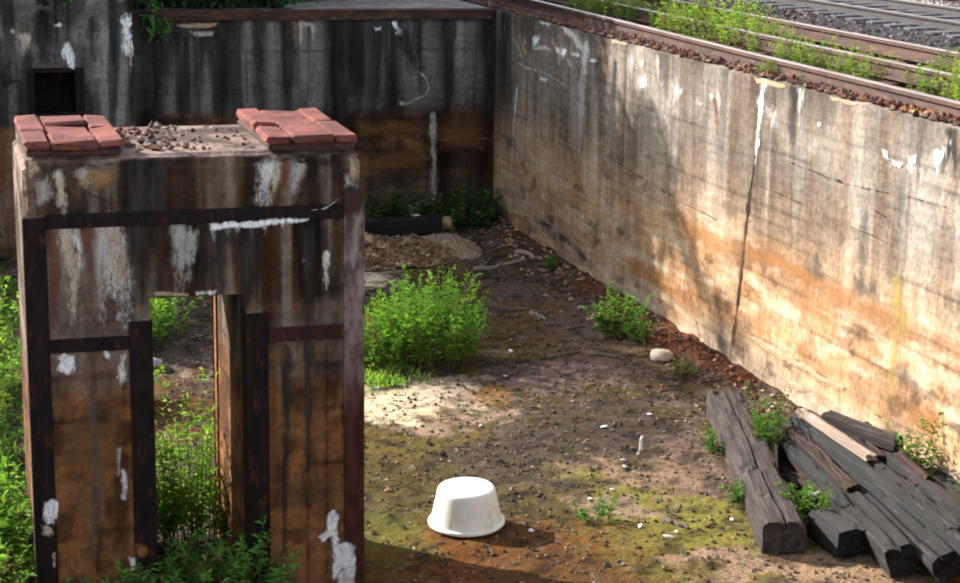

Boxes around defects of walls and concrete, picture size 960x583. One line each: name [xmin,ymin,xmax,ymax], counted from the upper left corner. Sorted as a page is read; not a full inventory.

efflorescence [53,169,67,214]
damp [61,41,75,69]
damp [87,13,134,73]
damp [125,157,171,212]
efflorescence [255,156,304,204]
efflorescence [428,114,437,187]
damp [532,27,599,139]
damp [755,78,777,162]
damp [788,86,804,142]
damp [49,224,195,317]
damp [210,202,335,308]
crack [730,147,946,362]